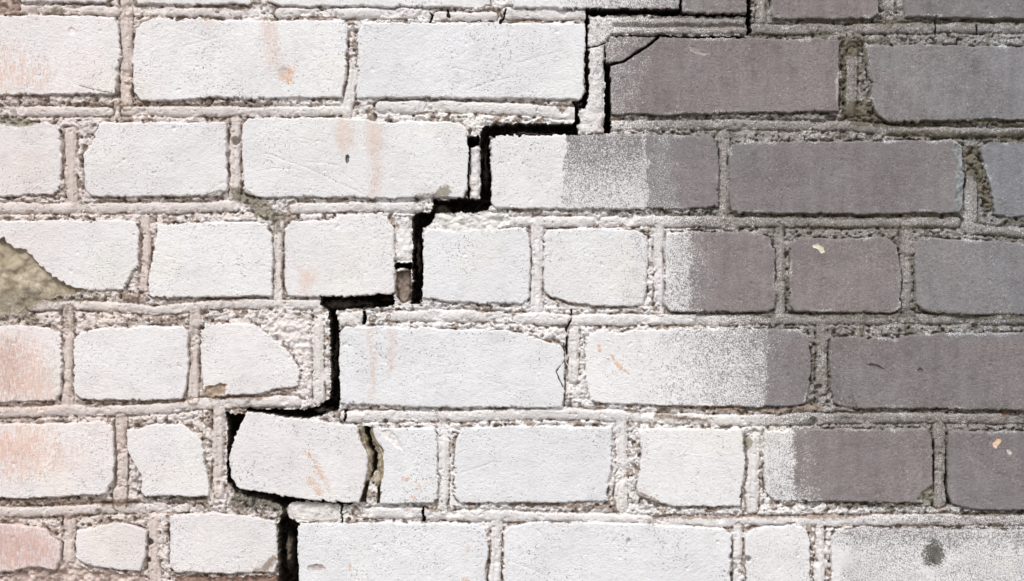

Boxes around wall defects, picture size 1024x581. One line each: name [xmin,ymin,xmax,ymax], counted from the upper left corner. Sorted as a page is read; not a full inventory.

spalling [0,237,89,316]
crack [225,0,752,581]